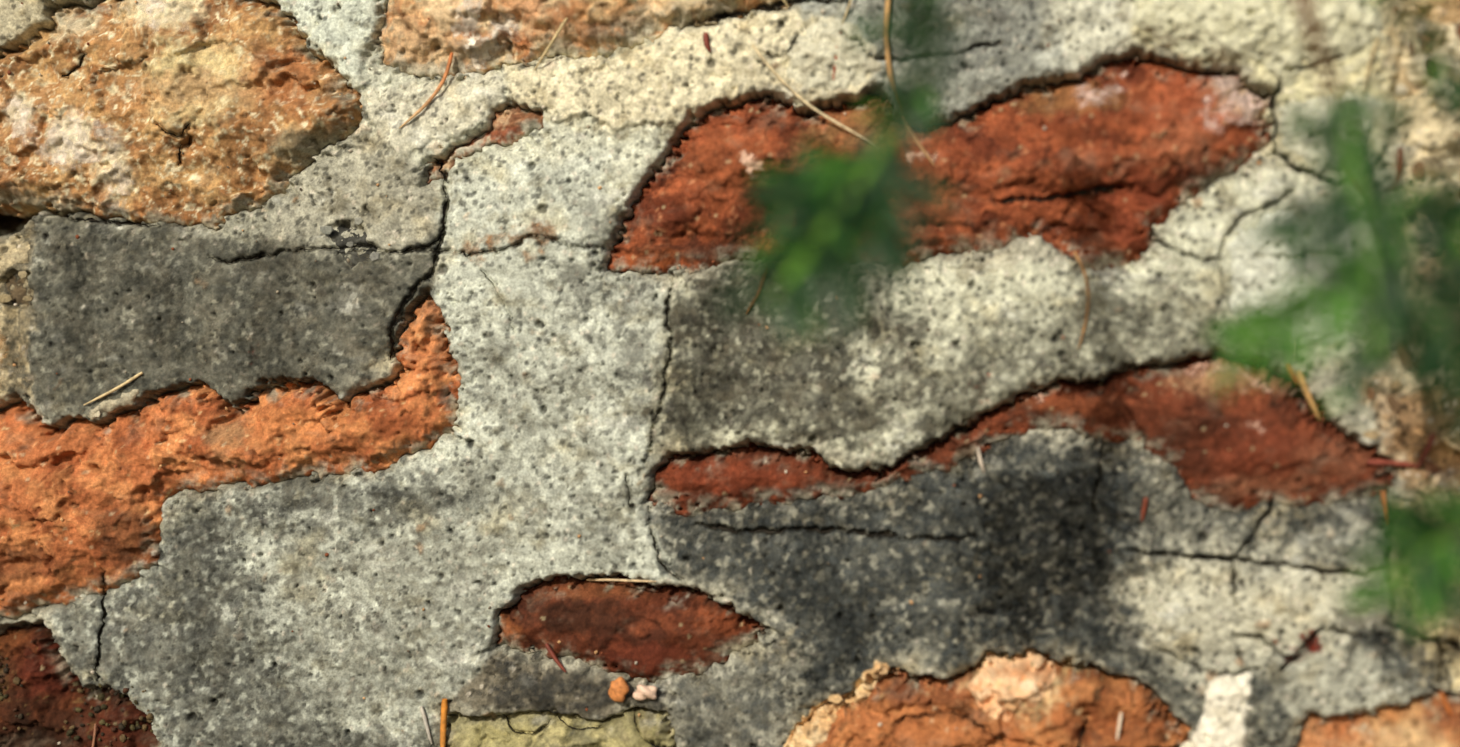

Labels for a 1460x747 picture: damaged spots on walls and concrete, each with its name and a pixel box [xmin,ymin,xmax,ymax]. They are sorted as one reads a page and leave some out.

crack [688,0,848,57]
crack [847,38,1004,62]
crack [1151,55,1386,272]
peeling [83,389,139,420]
crack [625,279,681,580]
crack [695,523,977,541]
crack [1128,501,1460,682]
spalling [783,660,890,747]
peeling [968,649,1056,722]